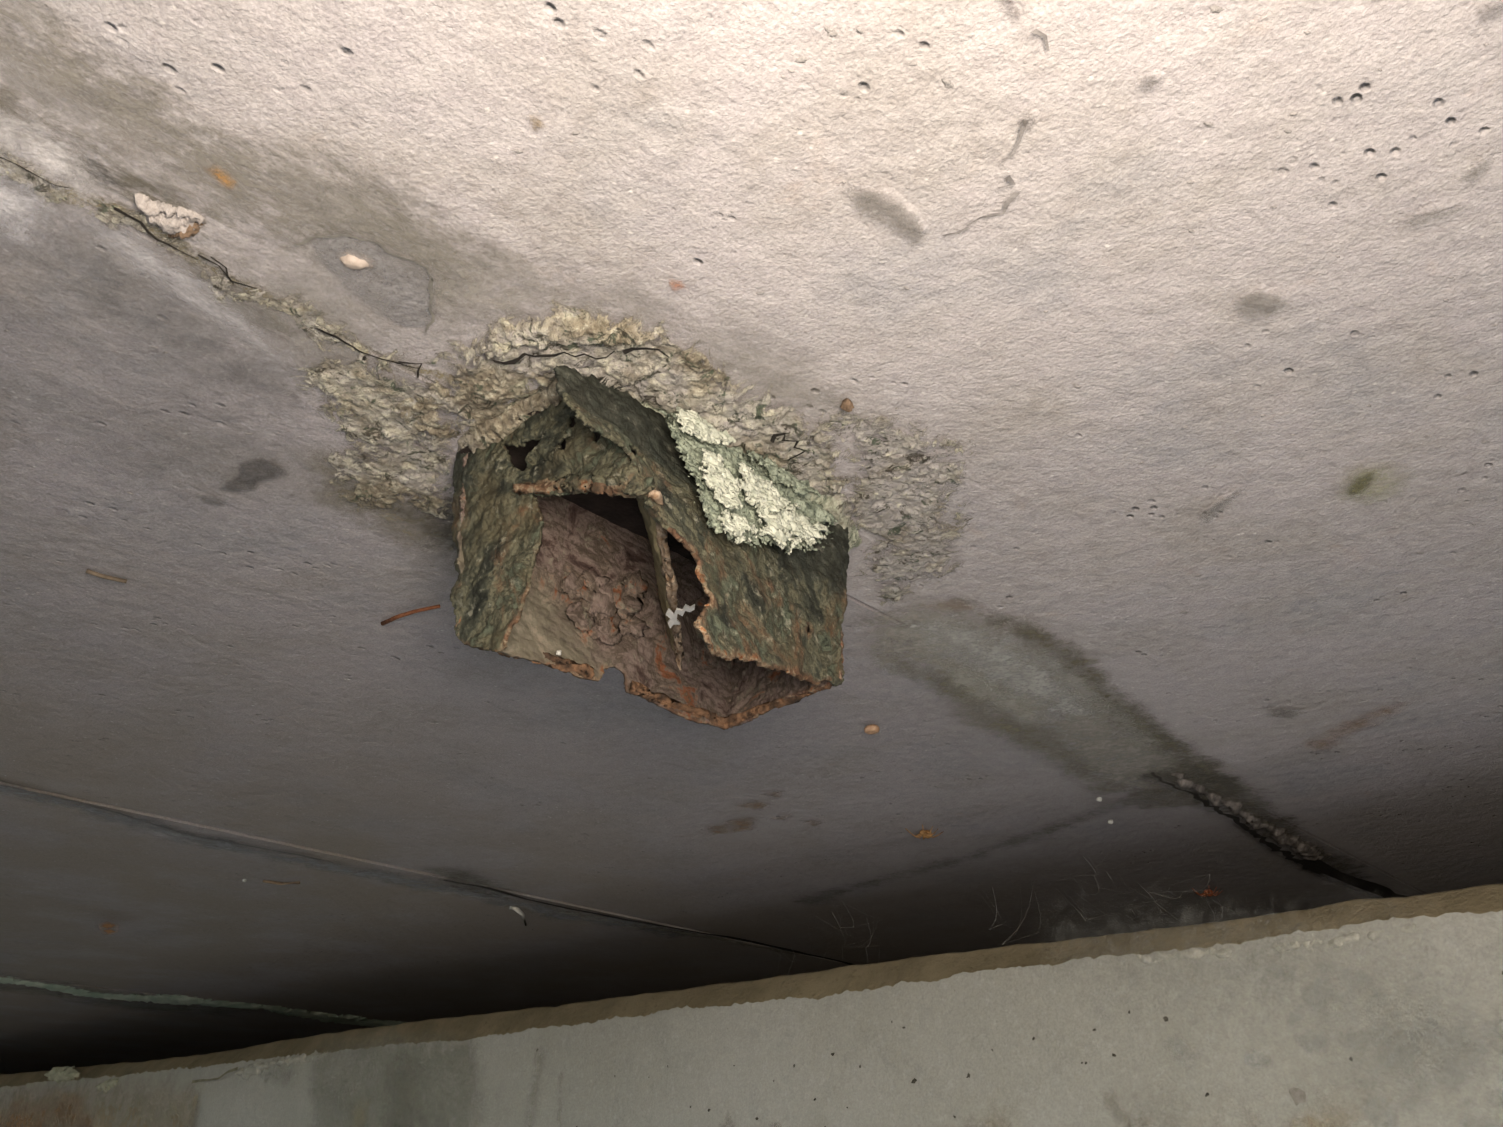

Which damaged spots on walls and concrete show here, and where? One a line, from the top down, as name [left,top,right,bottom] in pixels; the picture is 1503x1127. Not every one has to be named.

water stain [0,3,517,310]
crack [0,142,452,382]
water stain [105,229,347,352]
peeling [294,234,435,333]
spalling [285,299,981,613]
peeling [666,604,695,628]
water stain [870,602,1258,807]